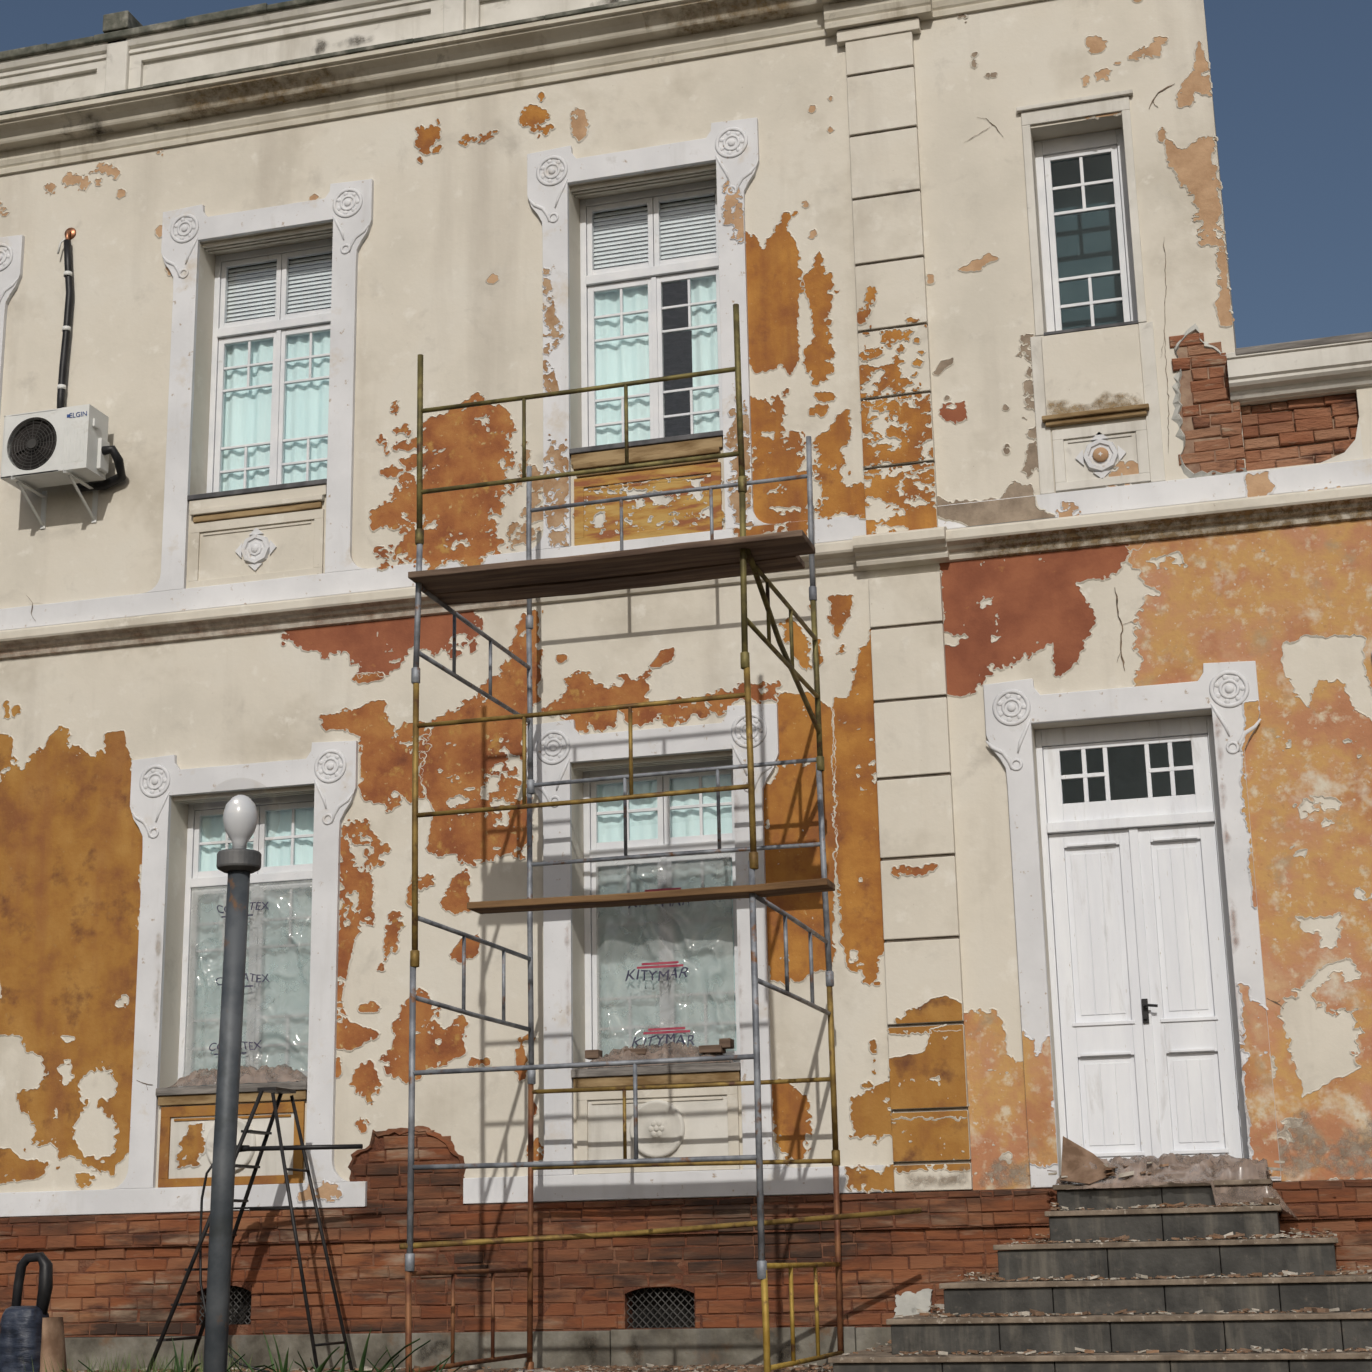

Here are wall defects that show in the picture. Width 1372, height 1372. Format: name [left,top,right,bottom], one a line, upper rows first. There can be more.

peeling [413,118,499,165]
peeling [518,91,591,143]
peeling [368,180,1081,572]
peeling [808,95,834,114]
peeling [1175,40,1213,109]
flaking render [1156,126,1276,497]
peeling [0,699,143,1190]
peeling [280,593,939,1208]
peeling [844,994,1058,1194]
peeling [938,519,1372,1182]